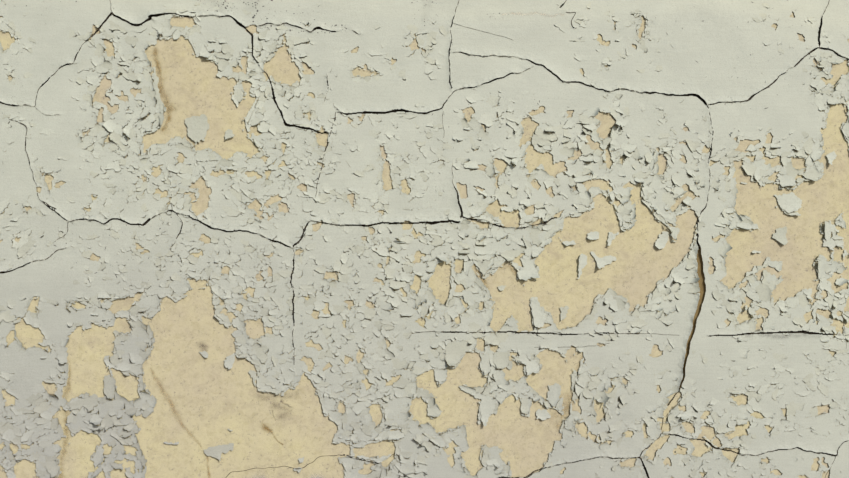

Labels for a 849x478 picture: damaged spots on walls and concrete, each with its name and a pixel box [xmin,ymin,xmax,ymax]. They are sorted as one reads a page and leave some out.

peeling [0,16,36,59]
crack [0,2,365,116]
peeling [331,102,382,128]
peeling [453,89,505,151]
peeling [0,154,75,259]
crack [0,117,557,360]
crack [264,0,849,478]
crack [226,454,429,478]
peeling [611,457,646,478]
peeling [627,369,786,478]